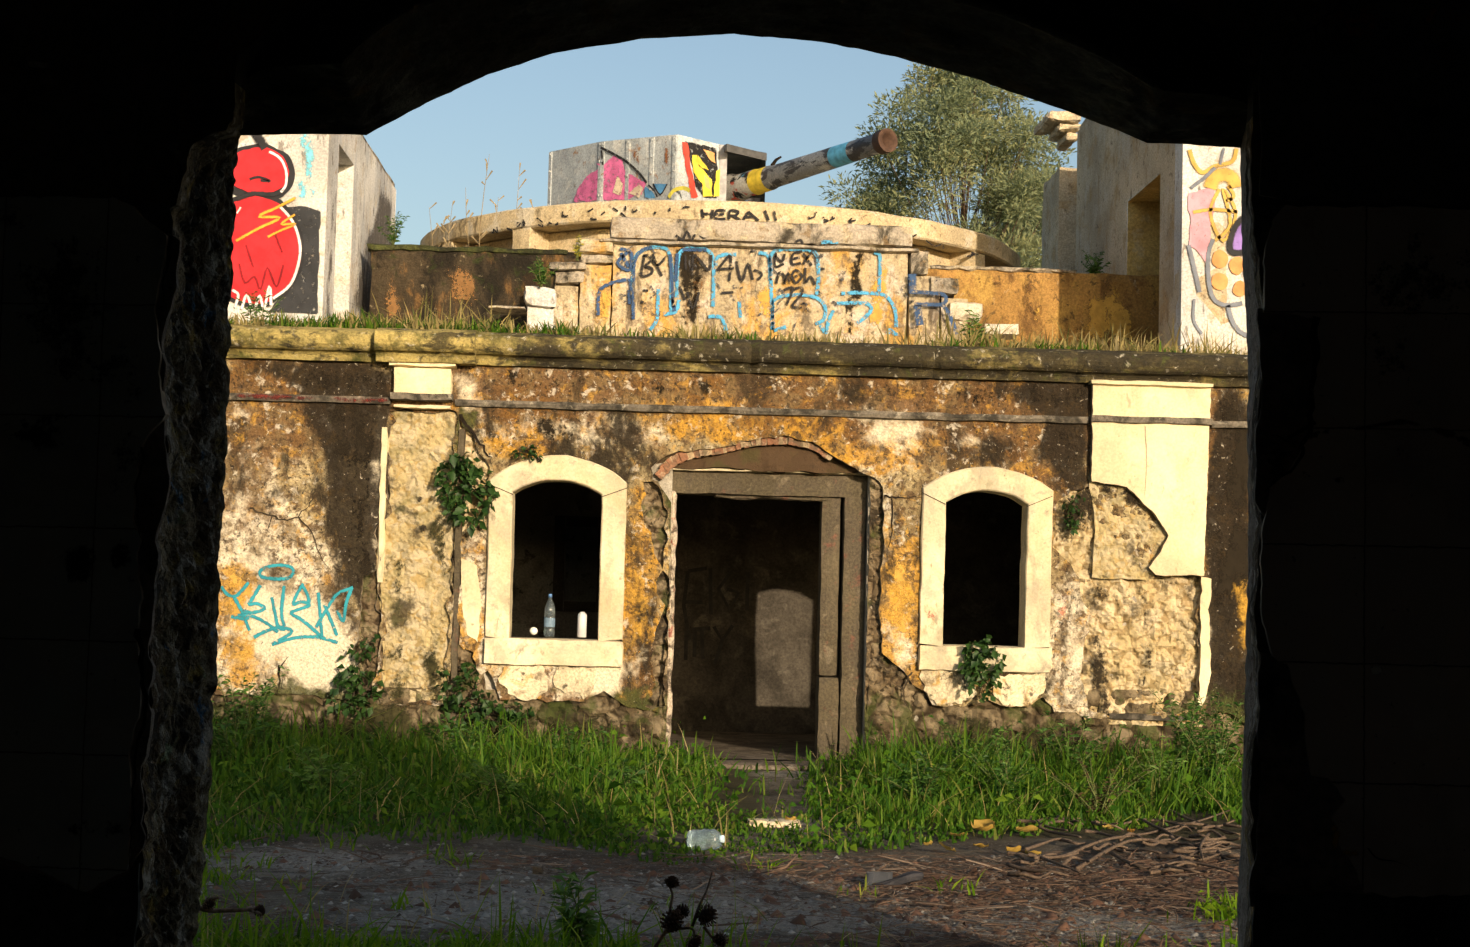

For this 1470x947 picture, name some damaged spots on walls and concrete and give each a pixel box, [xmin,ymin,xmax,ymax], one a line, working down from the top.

leakage [225,567,252,657]
leakage [306,369,385,582]
leakage [537,418,573,443]
leakage [889,528,911,653]
spalling [1053,475,1203,727]
leakage [1210,398,1249,623]